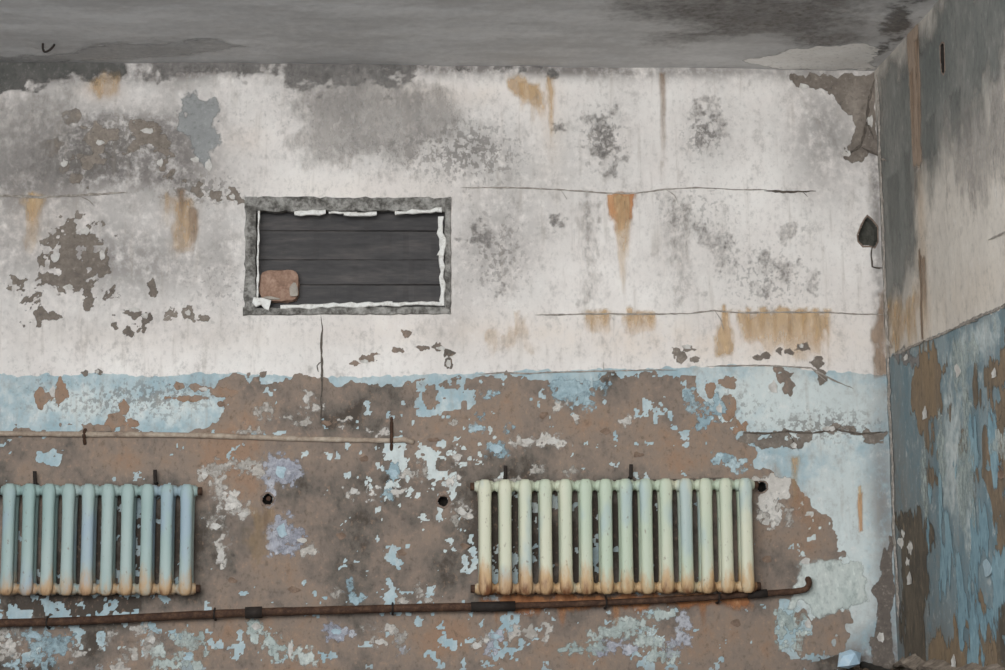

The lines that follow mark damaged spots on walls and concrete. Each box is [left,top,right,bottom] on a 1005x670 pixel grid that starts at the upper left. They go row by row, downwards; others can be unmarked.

leakage [0,39,455,156]
corrosion [608,192,634,231]
crack [461,187,812,205]
flaking render [789,72,878,163]
leakage [875,0,1005,320]
flaking render [6,210,119,328]
peeling [111,305,210,338]
peeling [392,329,412,353]
corrosion [717,306,829,355]
peeling [0,342,888,670]
peeling [869,329,1005,669]
corrosion [482,591,749,614]